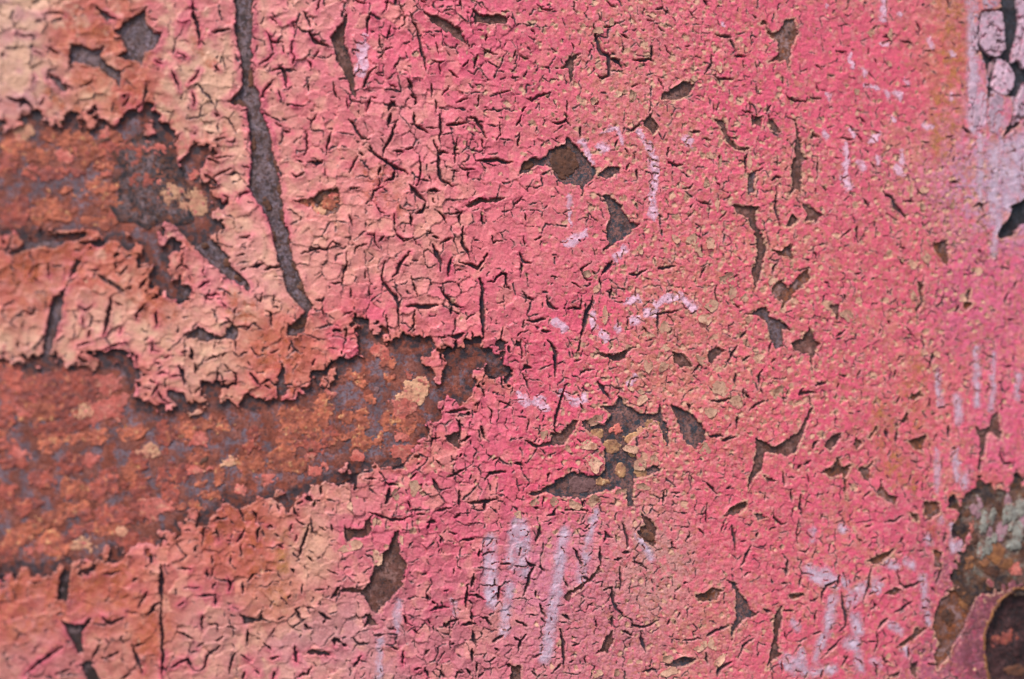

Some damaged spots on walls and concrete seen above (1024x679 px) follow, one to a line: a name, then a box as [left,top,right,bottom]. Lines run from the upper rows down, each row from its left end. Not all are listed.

crack [263,14,325,94]
peeling [0,89,254,302]
peeling [228,0,341,341]
peeling [520,138,619,201]
crack [83,267,268,401]
crack [81,490,359,678]
peeling [0,290,511,601]
crack [309,2,779,676]
peeling [530,386,711,546]
crack [688,332,859,441]
crack [731,441,940,677]
peeling [896,476,1024,679]